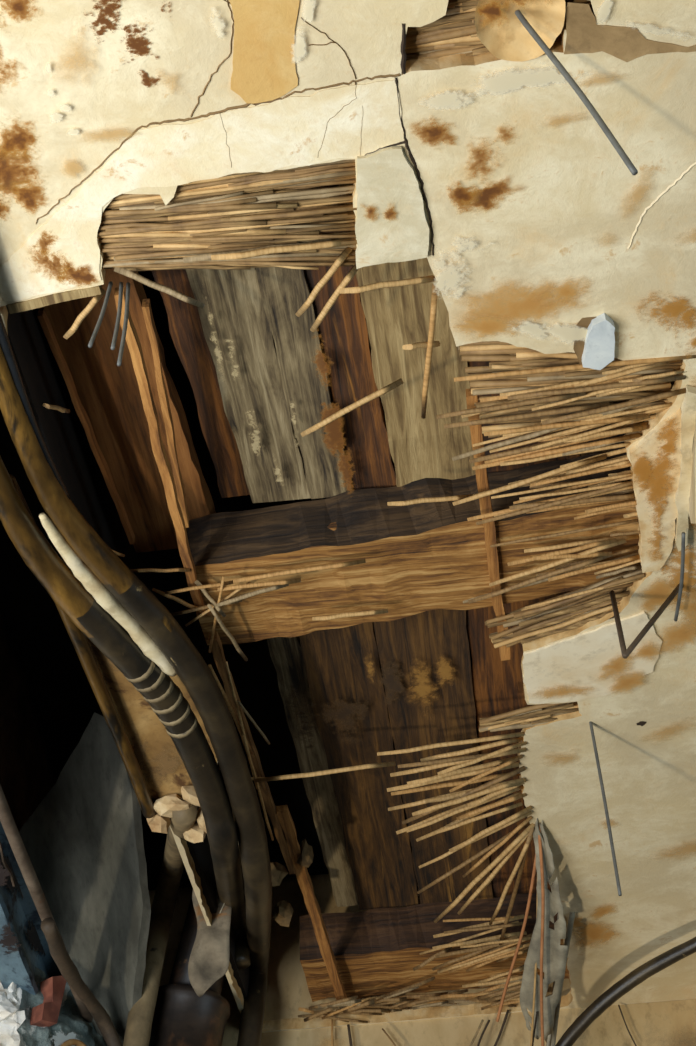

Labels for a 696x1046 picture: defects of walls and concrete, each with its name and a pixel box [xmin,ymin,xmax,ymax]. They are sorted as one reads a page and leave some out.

rust [3,0,36,20]
rust [84,0,159,63]
spalling [564,2,696,62]
crack [36,0,434,256]
rust [413,119,454,145]
rust [0,122,45,219]
rust [448,146,511,213]
spalling [573,313,615,370]
flaking render [630,408,696,573]
flaking render [522,611,662,704]
peeling [86,637,193,800]
spalling [0,982,26,1046]